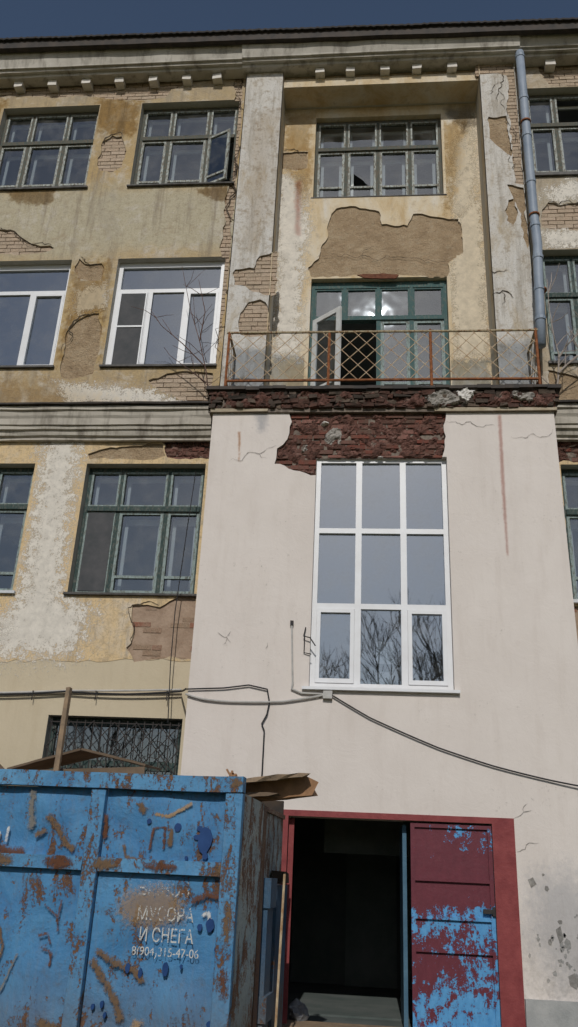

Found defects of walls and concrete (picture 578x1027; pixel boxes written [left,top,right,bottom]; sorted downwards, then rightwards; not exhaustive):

flaking render [0,229,53,255]
flaking render [97,135,126,173]
flaking render [216,64,578,365]
flaking render [51,259,578,475]
peeling [0,442,103,676]
flaking render [126,597,196,662]